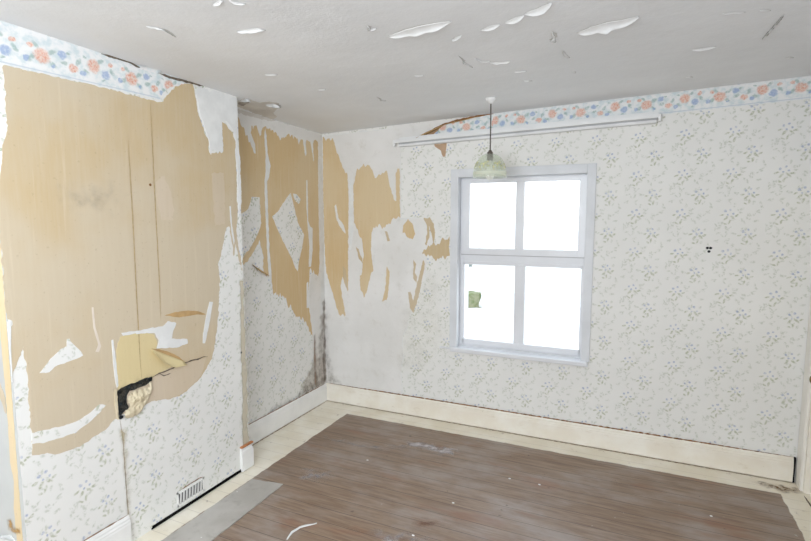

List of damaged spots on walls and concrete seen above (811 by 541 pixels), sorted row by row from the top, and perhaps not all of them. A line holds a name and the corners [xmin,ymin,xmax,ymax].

peeling [388,21,451,39]
peeling [481,2,552,31]
peeling [577,16,639,36]
flaking render [322,128,450,394]
peeling [111,321,188,420]